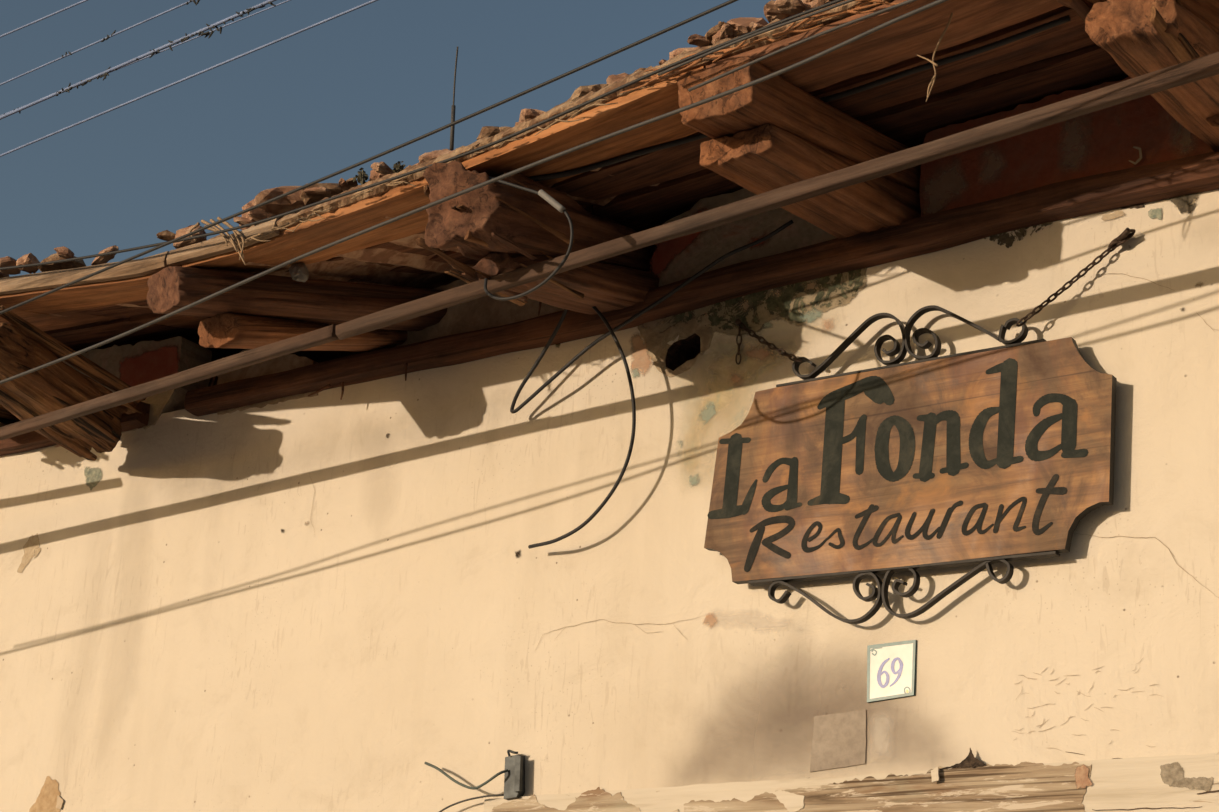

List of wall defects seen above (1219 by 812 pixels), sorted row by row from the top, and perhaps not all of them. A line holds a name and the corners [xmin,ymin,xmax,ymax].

flaking render [631,267,867,444]
peeling [17,534,40,573]
crack [1083,534,1219,598]
crack [536,616,701,648]
peeling [30,776,64,812]
peeling [492,787,641,812]
peeling [672,761,1092,812]
peeling [1160,762,1214,792]